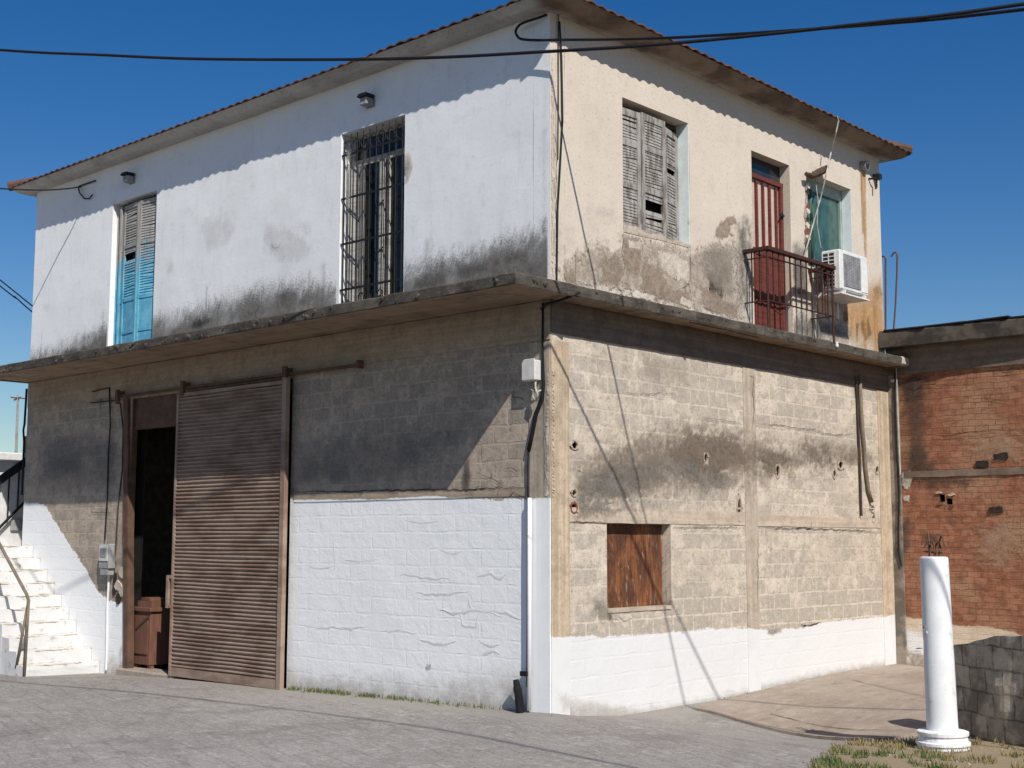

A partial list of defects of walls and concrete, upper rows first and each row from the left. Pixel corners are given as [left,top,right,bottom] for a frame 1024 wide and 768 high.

peeling [532,58,759,338]
water stain [404,218,548,292]
water stain [152,279,336,338]
rust [842,287,884,350]
water stain [579,433,744,513]